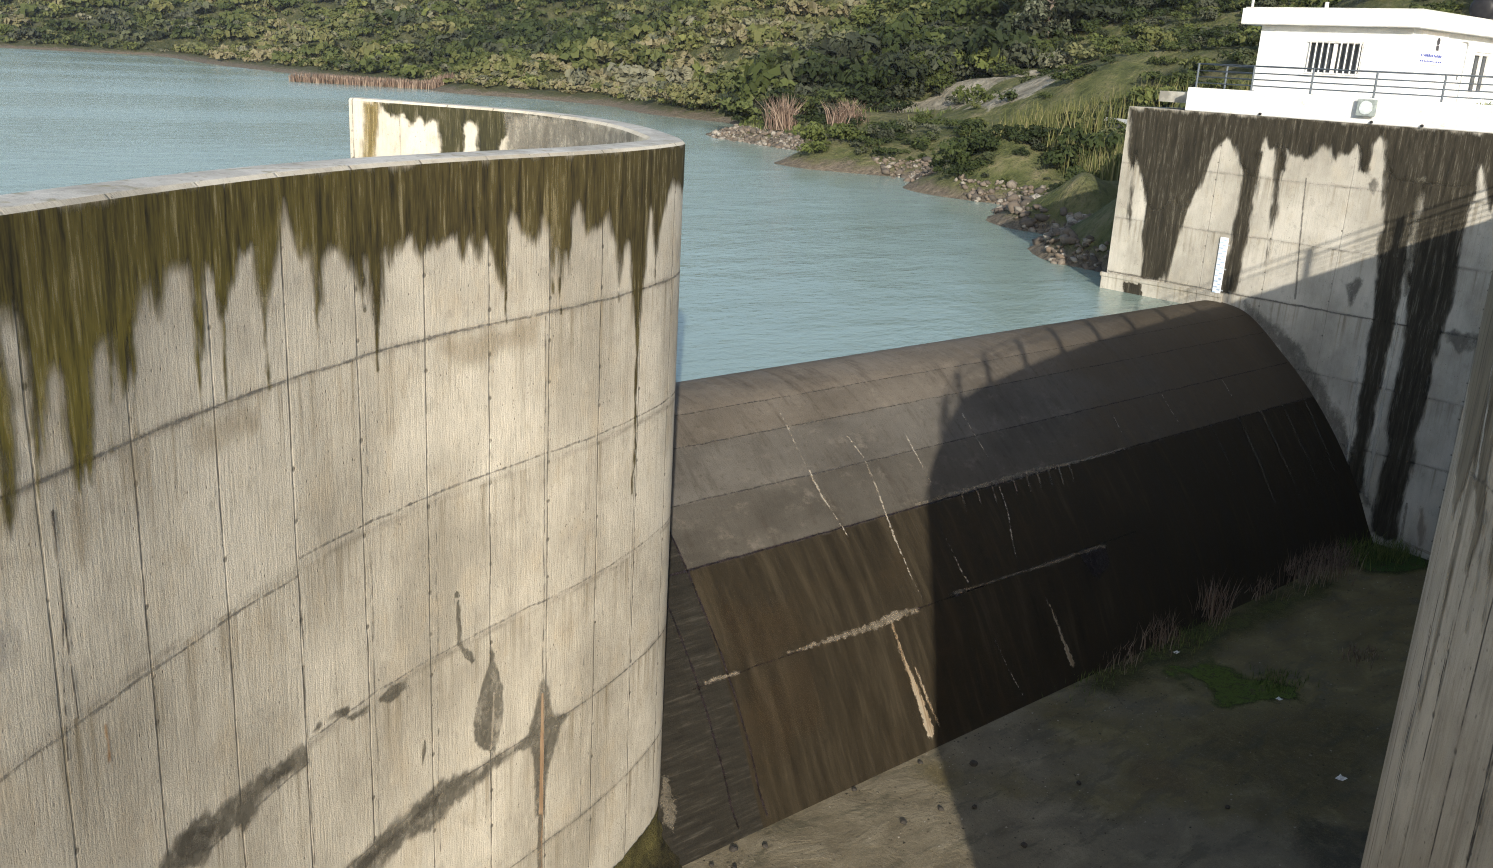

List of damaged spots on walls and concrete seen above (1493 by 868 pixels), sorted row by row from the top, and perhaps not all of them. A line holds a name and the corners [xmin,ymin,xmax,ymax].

water stain [0,102,685,531]
water stain [1123,107,1493,596]
water stain [351,591,567,868]